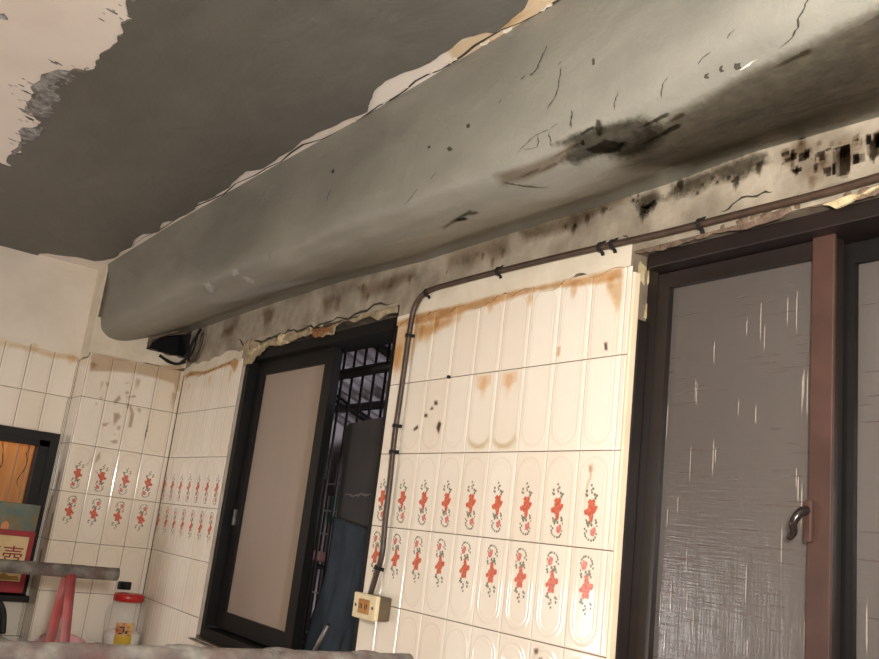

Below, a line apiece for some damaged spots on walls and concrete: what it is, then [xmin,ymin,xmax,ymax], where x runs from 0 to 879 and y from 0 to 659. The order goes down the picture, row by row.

crack [779,0,808,49]
spalling [704,62,752,79]
leakage [564,114,679,161]
leakage [674,156,765,194]
leakage [633,194,660,218]
flaking render [635,185,879,284]
flaking render [242,306,398,367]